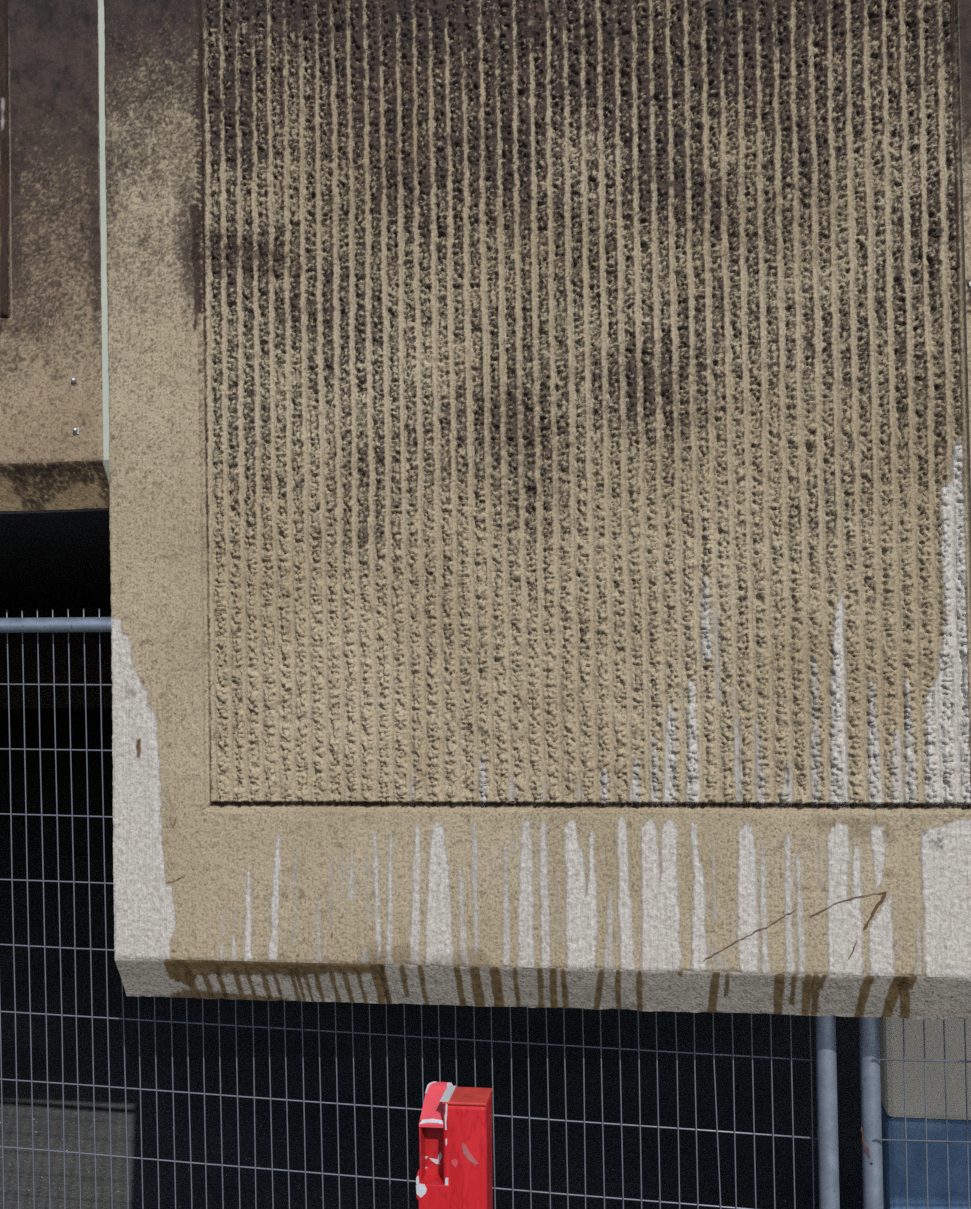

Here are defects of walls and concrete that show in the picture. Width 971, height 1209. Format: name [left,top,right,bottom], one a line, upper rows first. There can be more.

water stain [191,203,202,330]
water stain [0,460,110,511]
water stain [111,440,971,1019]